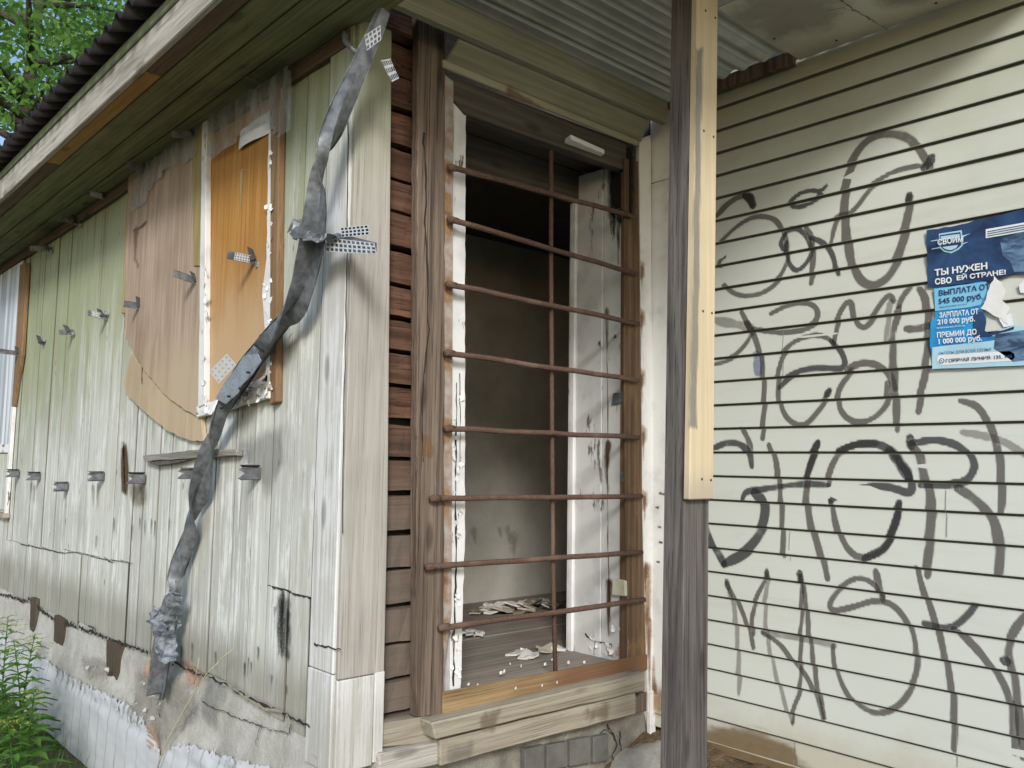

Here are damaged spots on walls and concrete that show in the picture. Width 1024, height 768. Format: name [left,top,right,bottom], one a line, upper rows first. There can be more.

leakage [608,145,634,260]
peeling [201,378,218,415]
peeling [237,362,273,406]
crack [22,544,130,564]
peeling [451,373,465,686]
leakage [274,591,290,659]
rust [644,565,661,712]
spalling [56,658,238,768]
crack [174,661,310,745]